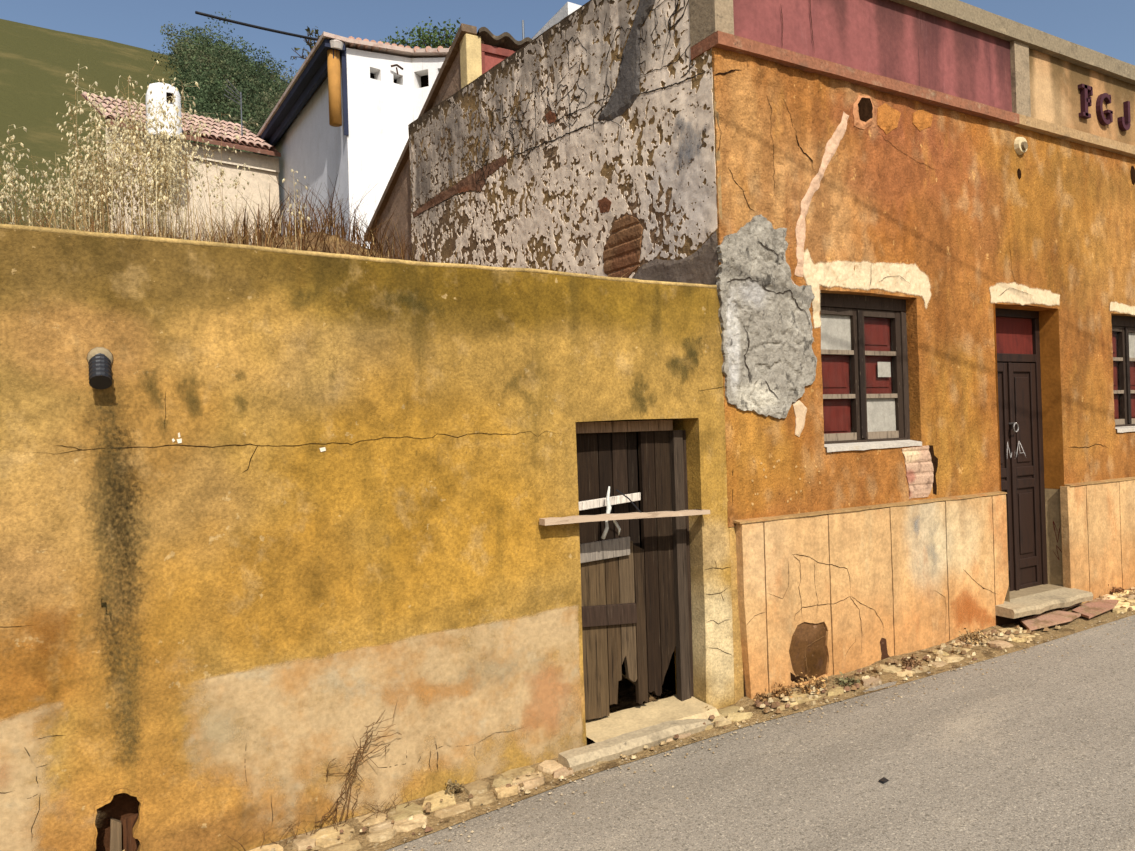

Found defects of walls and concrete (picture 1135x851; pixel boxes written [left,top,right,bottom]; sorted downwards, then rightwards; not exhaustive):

crack [409,0,737,232]
spalling [852,95,933,135]
peeling [409,0,817,437]
crack [33,393,568,471]
crack [705,554,882,656]
spalling [789,622,827,683]
crack [0,735,64,834]
spalling [93,788,144,851]